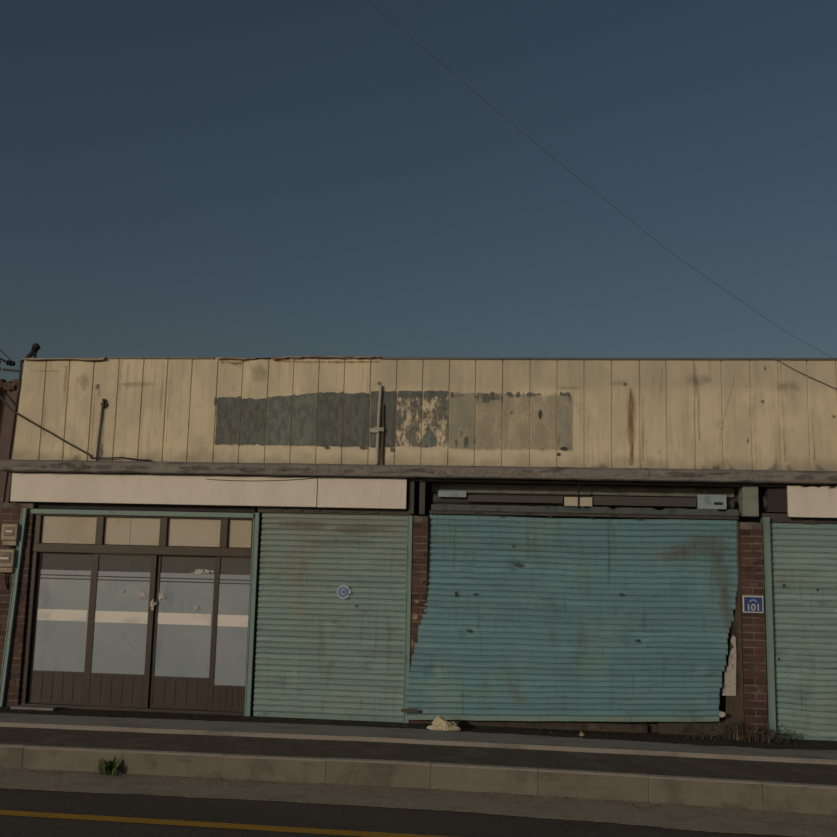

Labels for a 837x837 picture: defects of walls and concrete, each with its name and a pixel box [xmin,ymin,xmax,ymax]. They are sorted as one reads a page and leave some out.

peeling [214,390,572,456]
peeling [722,636,736,696]